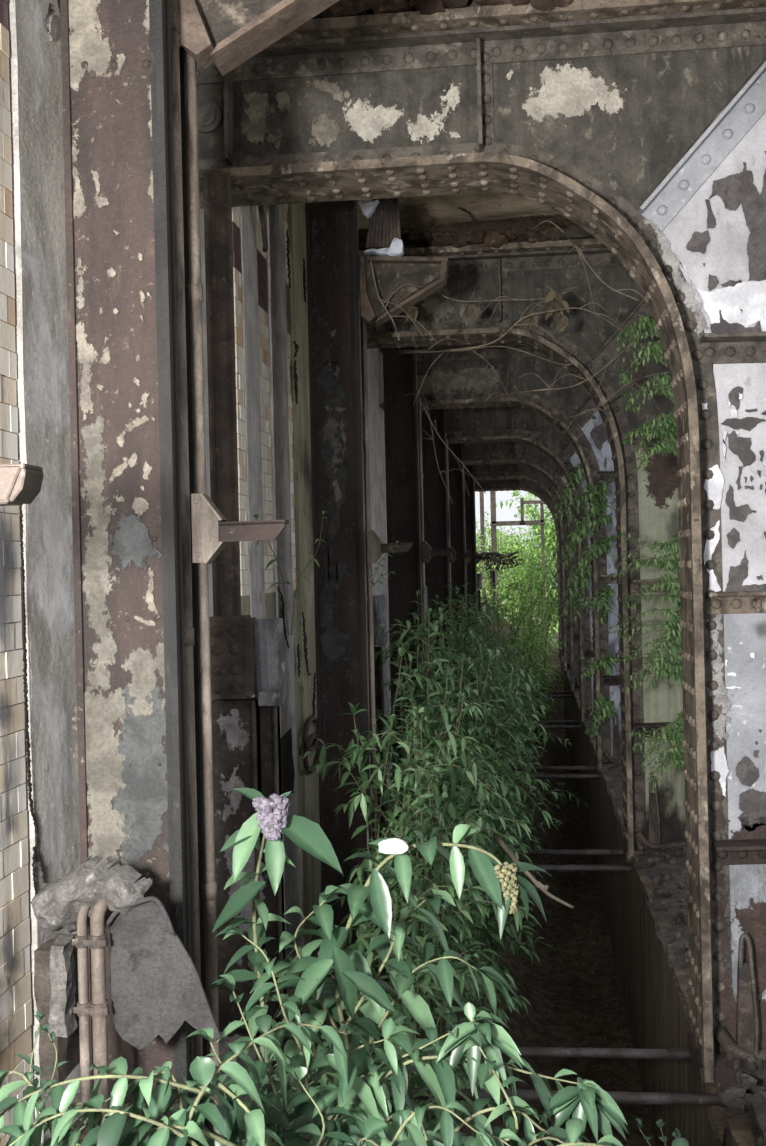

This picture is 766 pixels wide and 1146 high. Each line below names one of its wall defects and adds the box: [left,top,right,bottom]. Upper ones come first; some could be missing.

peeling [47,0,125,91]
peeling [240,74,463,150]
peeling [505,61,628,126]
peeling [686,162,766,292]
peeling [75,254,165,717]
peeling [704,386,766,592]
water stain [0,511,14,656]
water stain [0,679,10,730]
water stain [5,745,14,834]
peeling [710,729,766,831]
water stain [3,916,16,1043]
rust [732,898,766,1003]